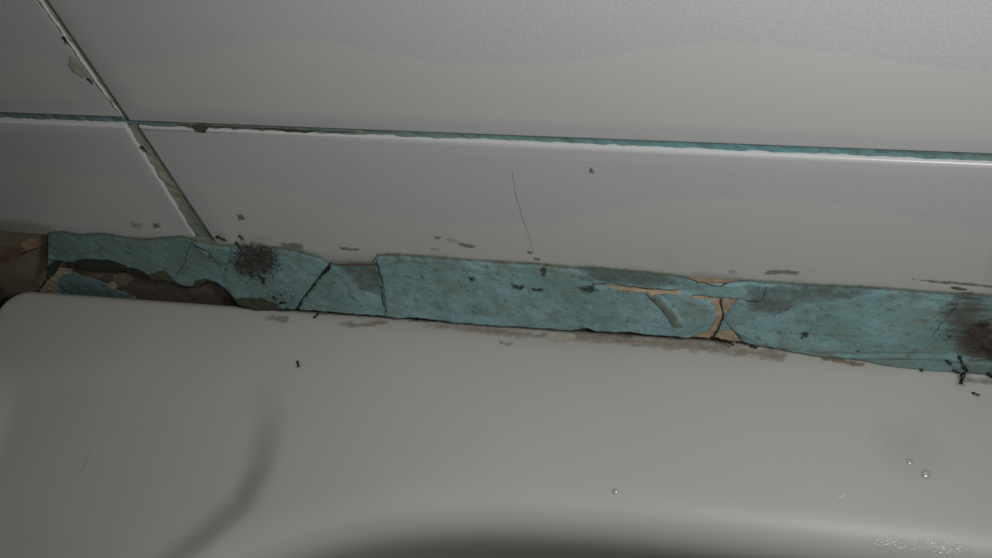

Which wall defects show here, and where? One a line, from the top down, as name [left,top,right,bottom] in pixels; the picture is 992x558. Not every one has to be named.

spalling [39,259,293,311]
leakage [233,243,282,284]
crack [297,263,791,347]
peeling [579,277,742,342]